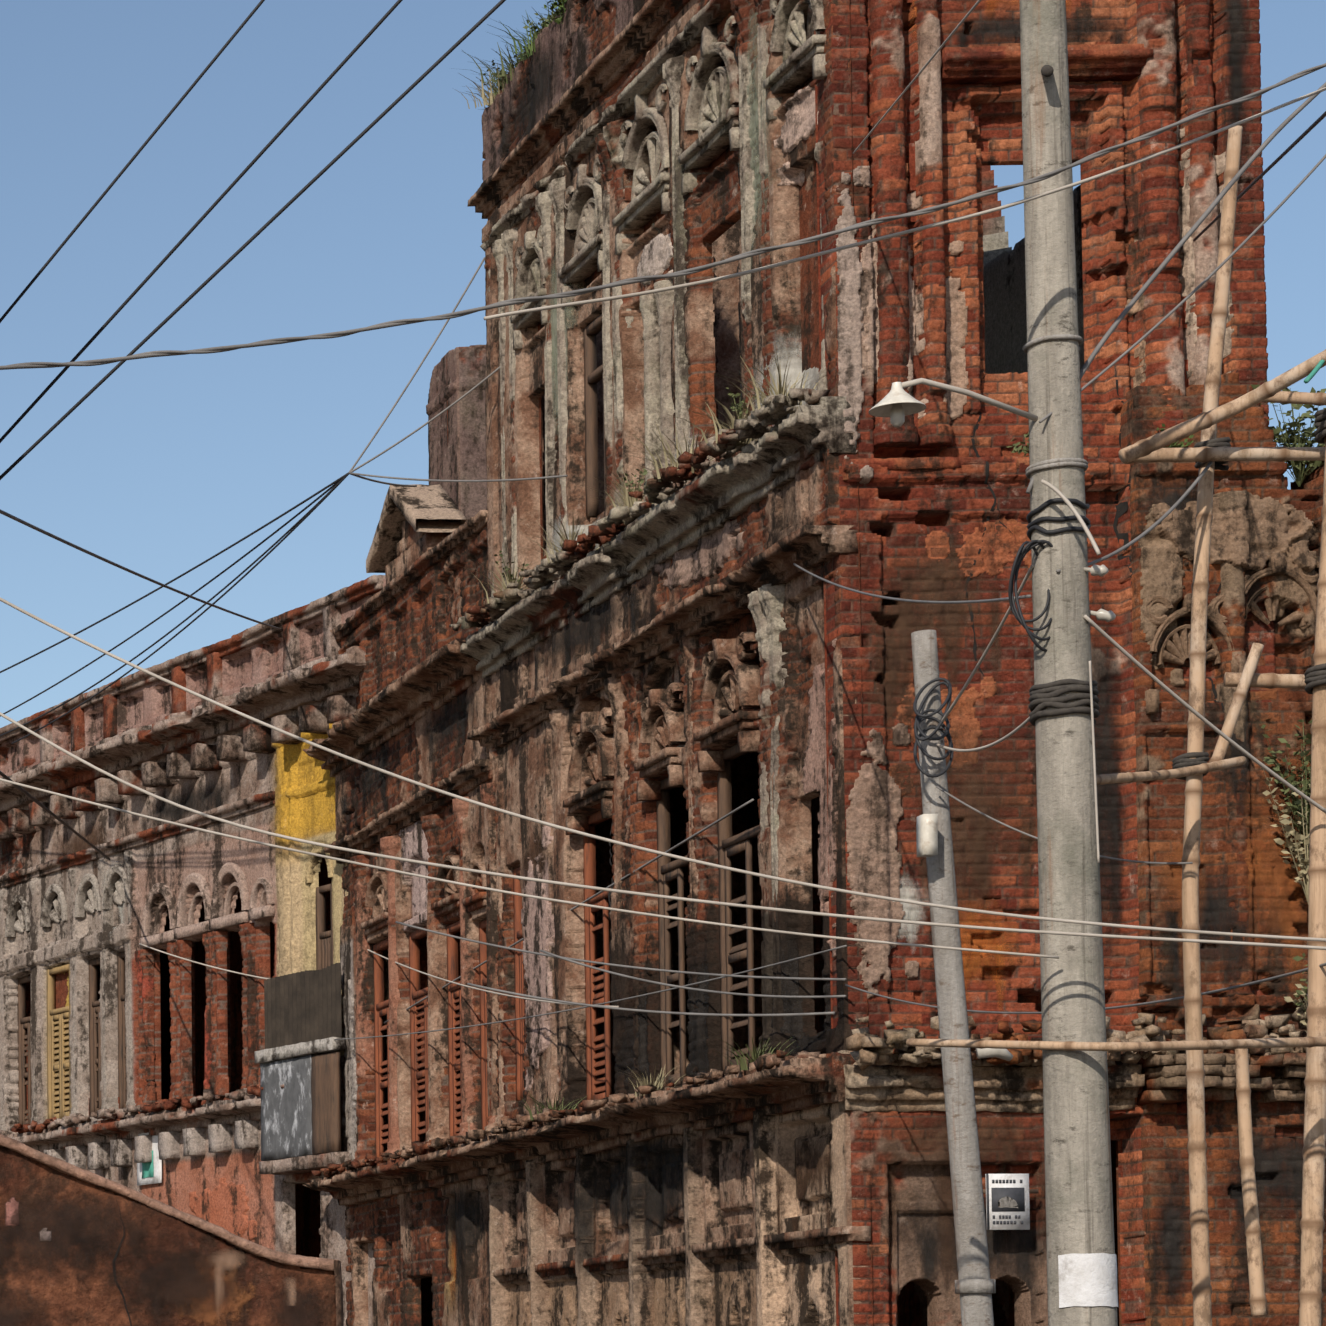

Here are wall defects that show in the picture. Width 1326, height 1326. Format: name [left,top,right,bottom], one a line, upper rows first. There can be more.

leakage [501,50,557,162]
flaking render [906,191,923,212]
flaking render [835,166,879,484]
flaking render [1138,504,1185,686]
spalling [941,676,997,769]
flaking render [801,662,919,998]
leakage [0,1194,235,1326]
leakage [272,1283,320,1326]
leakage [445,1191,489,1288]
leakage [575,1140,687,1271]
leakage [777,1138,831,1274]